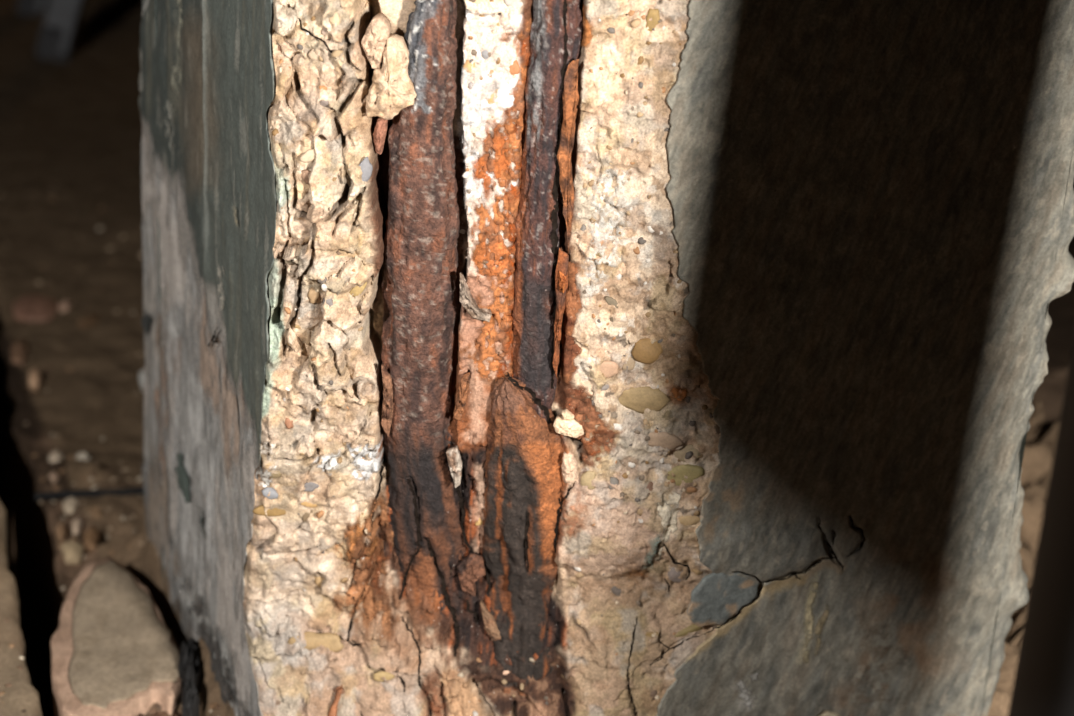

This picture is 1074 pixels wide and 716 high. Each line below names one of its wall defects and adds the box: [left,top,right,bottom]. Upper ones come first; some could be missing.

corrosion [581,1,593,46]
corrosion [464,16,532,382]
spalling [139,0,759,716]
corrosion [557,261,619,468]
crack [344,466,492,716]
crack [627,516,865,716]